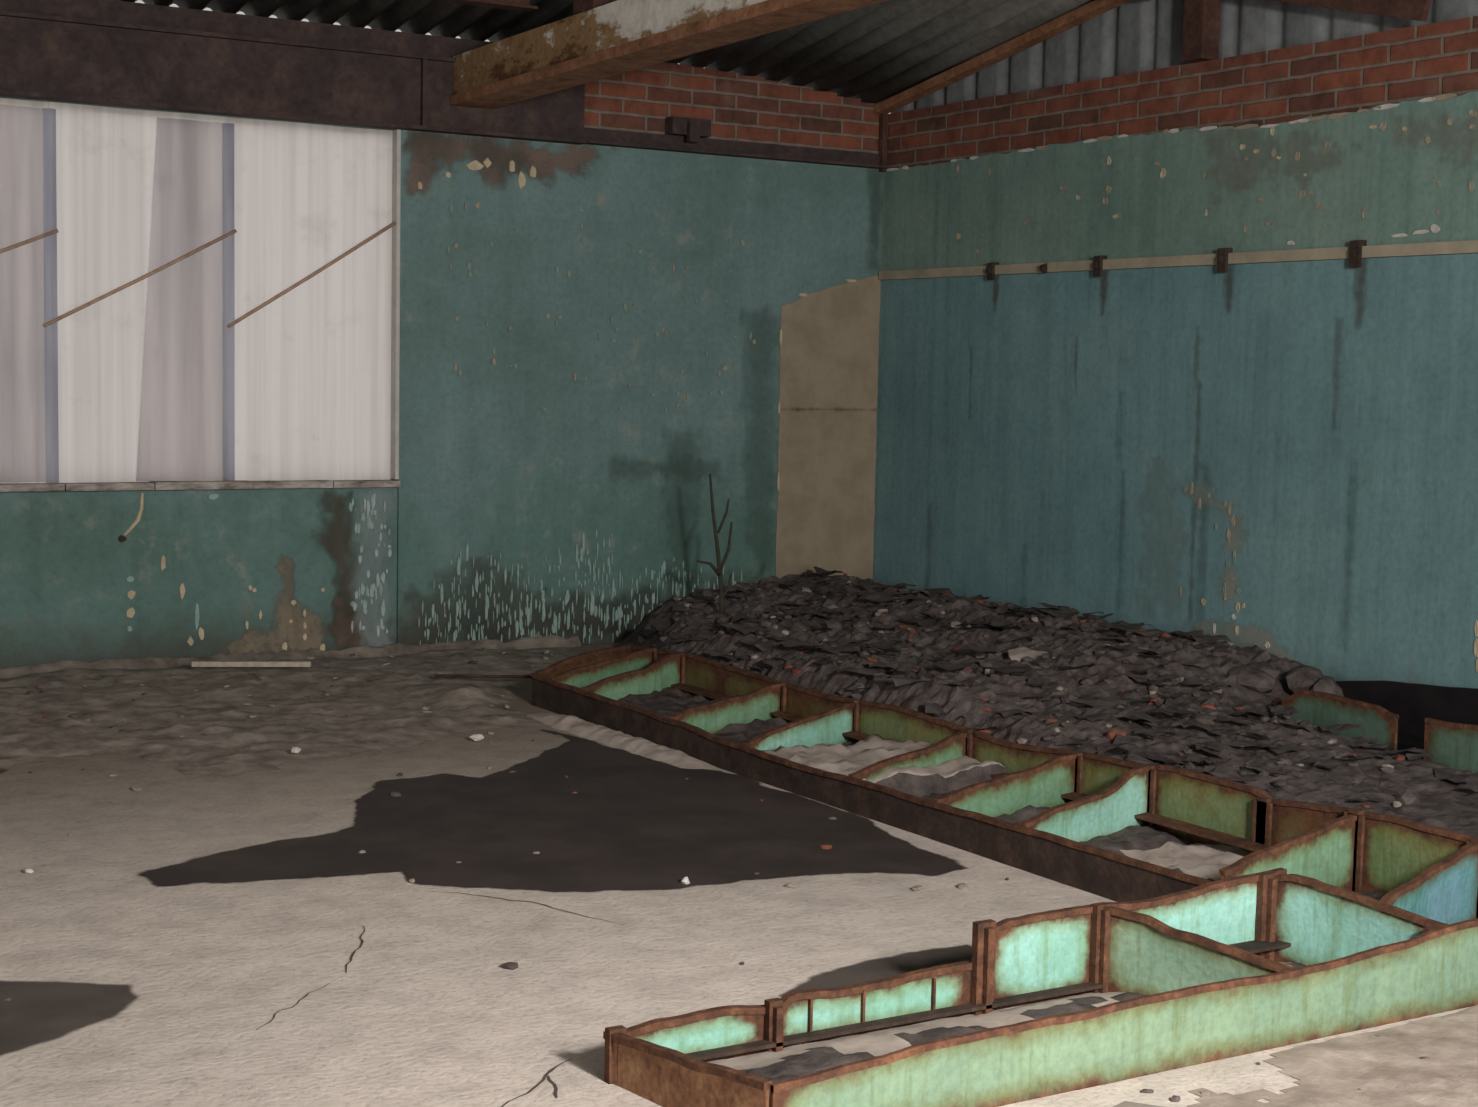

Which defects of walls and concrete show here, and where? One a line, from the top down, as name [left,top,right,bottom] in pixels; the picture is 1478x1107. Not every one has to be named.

peeling [404,131,596,195]
flaking render [1083,134,1128,165]
flaking render [1199,104,1407,210]
flaking render [1418,93,1477,129]
peeling [228,557,327,655]
damp [322,493,383,647]
crack [257,926,365,1030]
crack [501,1058,572,1107]